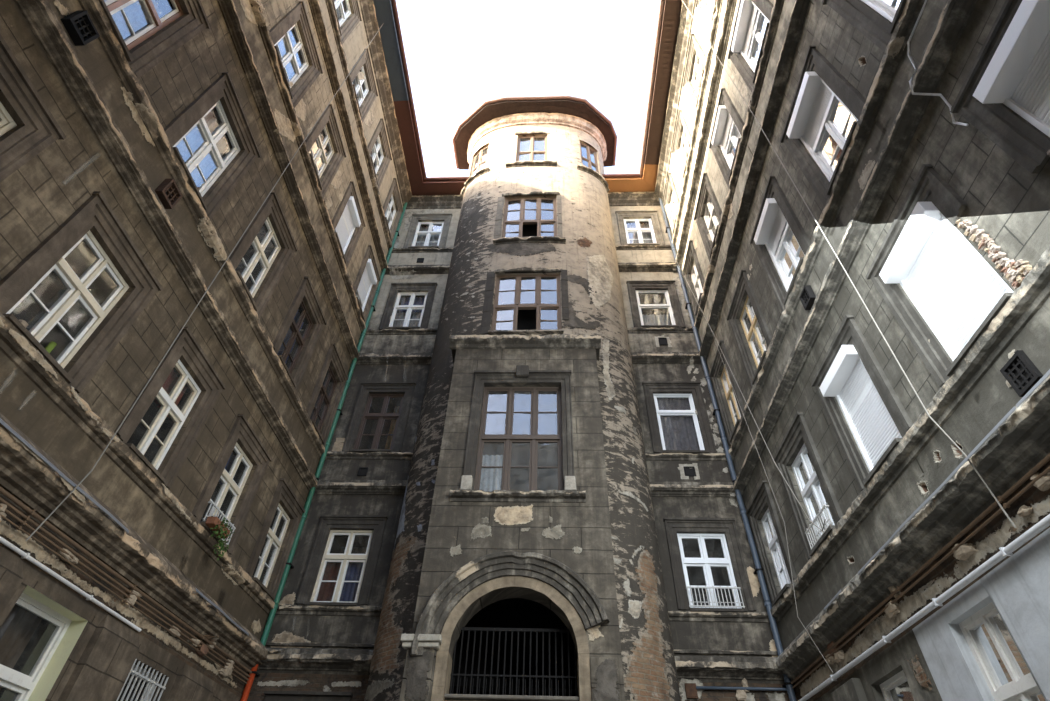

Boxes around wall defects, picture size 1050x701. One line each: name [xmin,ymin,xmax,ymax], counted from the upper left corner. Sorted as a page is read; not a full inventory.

peeling [445,195,485,320]
spalling [955,219,1033,289]
spalling [563,255,626,414]
spalling [162,483,200,530]
spalling [450,504,565,557]
peeling [616,490,648,512]
peeling [678,463,700,480]
spalling [914,433,970,502]
spalling [0,520,237,688]
spalling [251,619,261,635]
spalling [587,625,604,641]
spalling [800,495,1050,697]